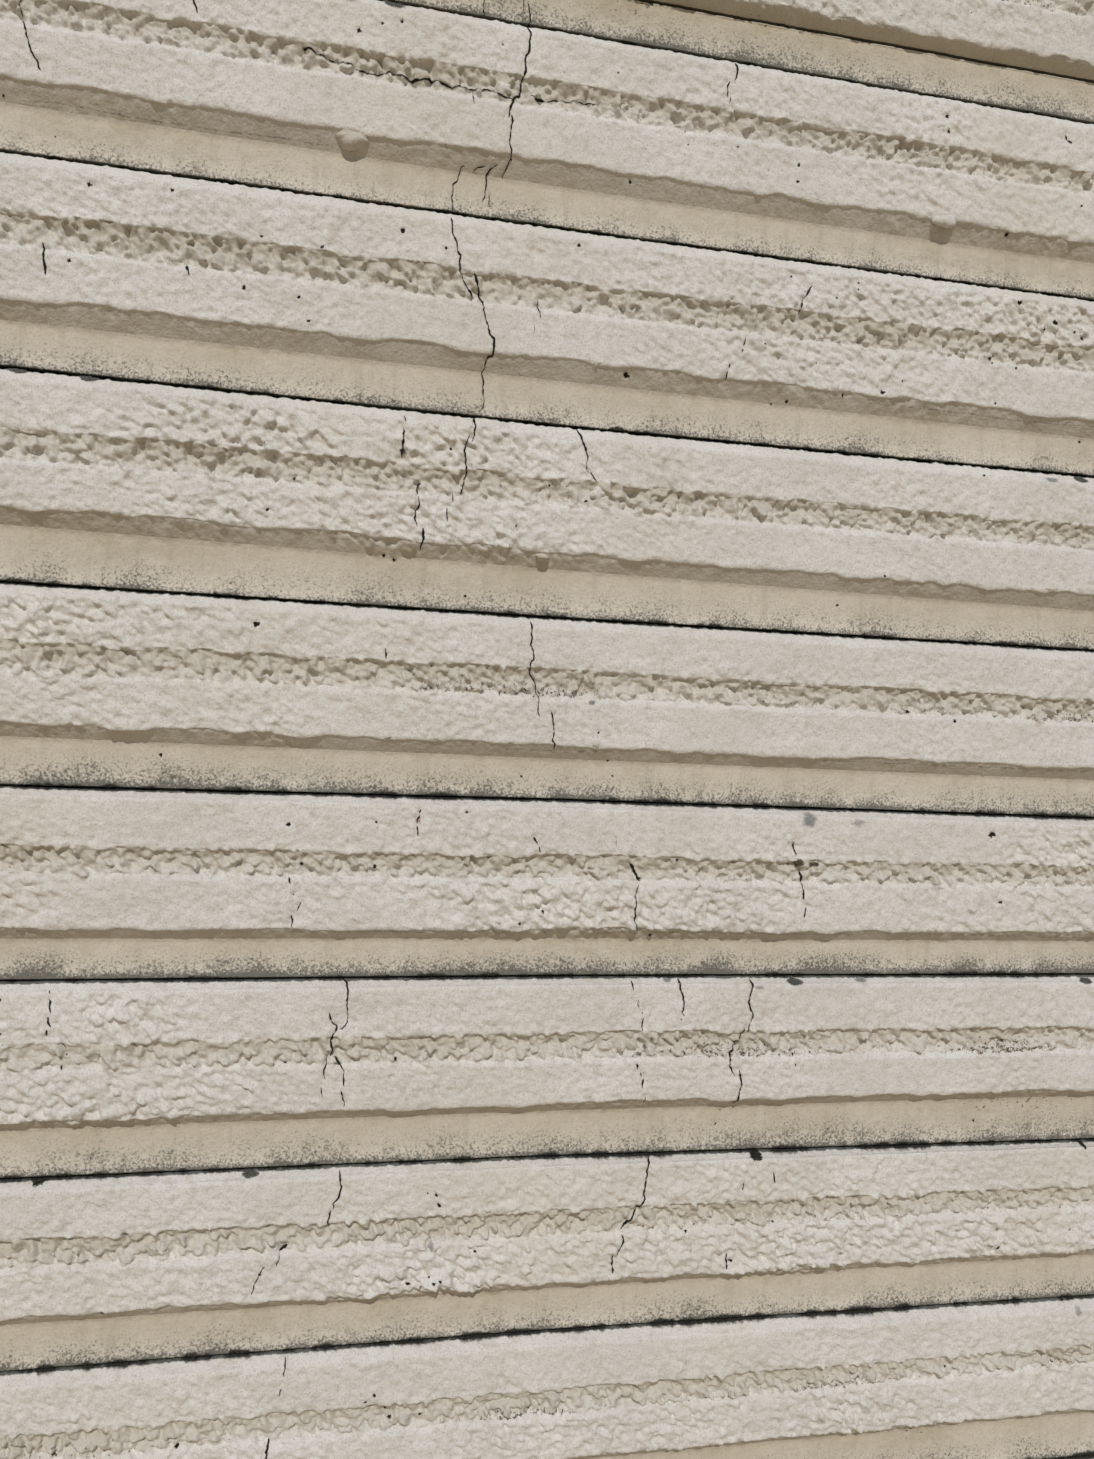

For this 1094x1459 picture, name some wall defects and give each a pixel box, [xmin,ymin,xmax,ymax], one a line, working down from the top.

crack [18,0,41,70]
crack [303,0,597,550]
crack [528,618,556,748]
crack [321,977,349,1105]
crack [714,979,754,1125]
crack [611,1156,650,1273]